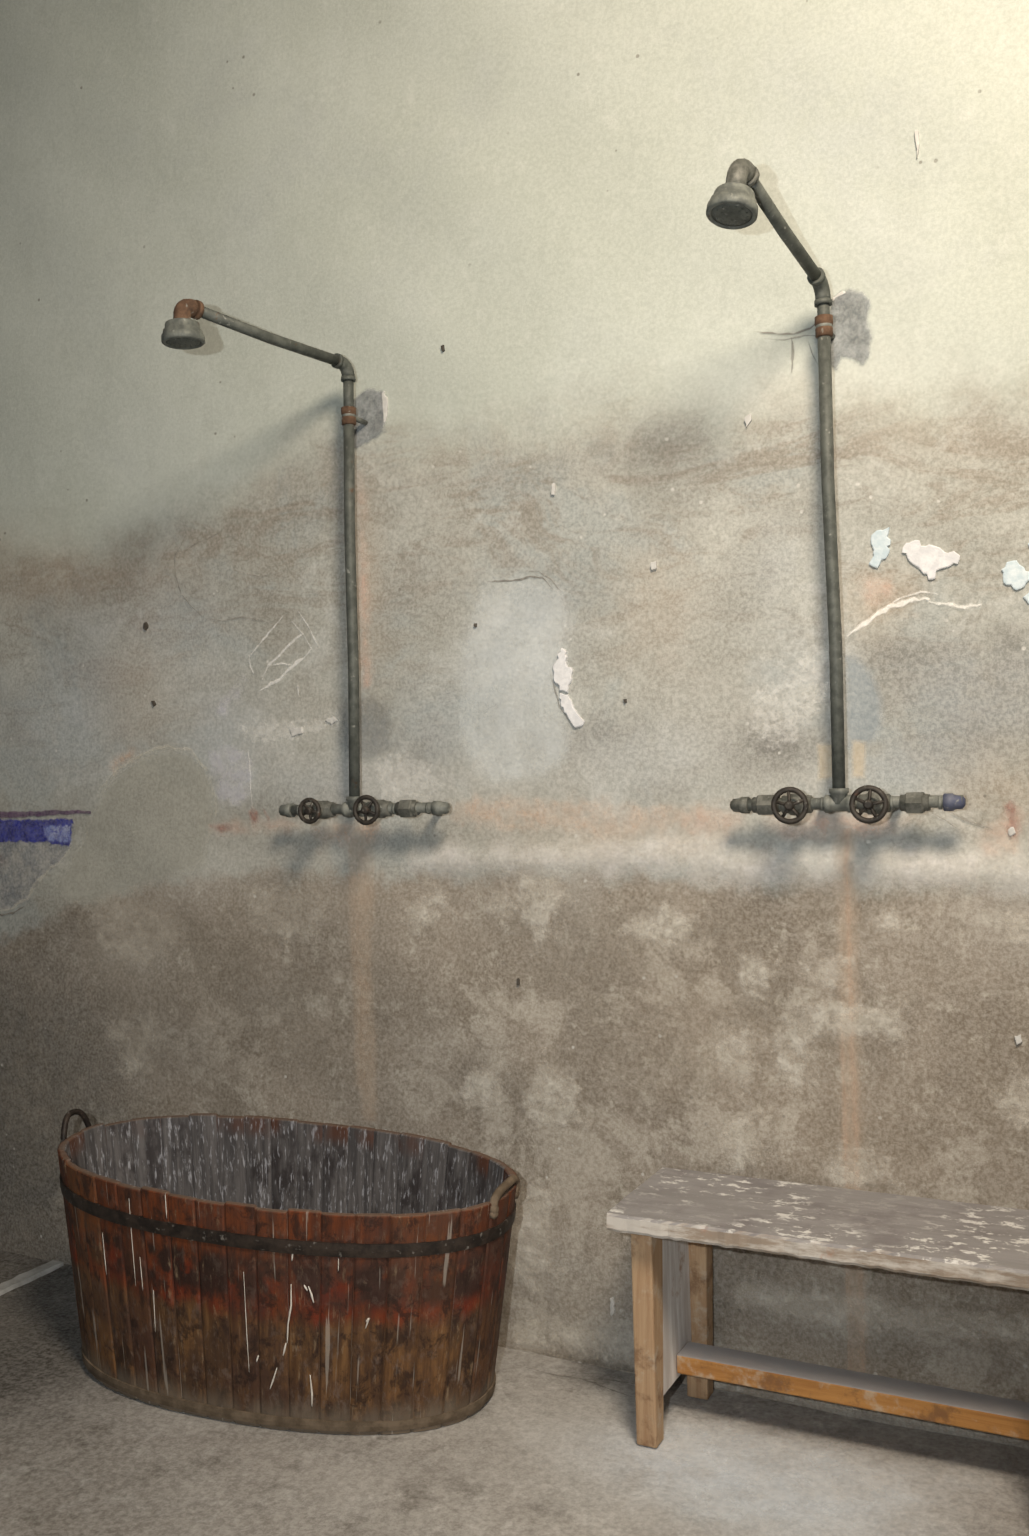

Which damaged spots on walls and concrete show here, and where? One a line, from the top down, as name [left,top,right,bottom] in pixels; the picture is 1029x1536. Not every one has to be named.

peeling [869,527,960,580]
peeling [1002,560,1029,603]
crack [851,591,974,633]
peeling [553,648,585,728]
leakage [778,969,899,1080]